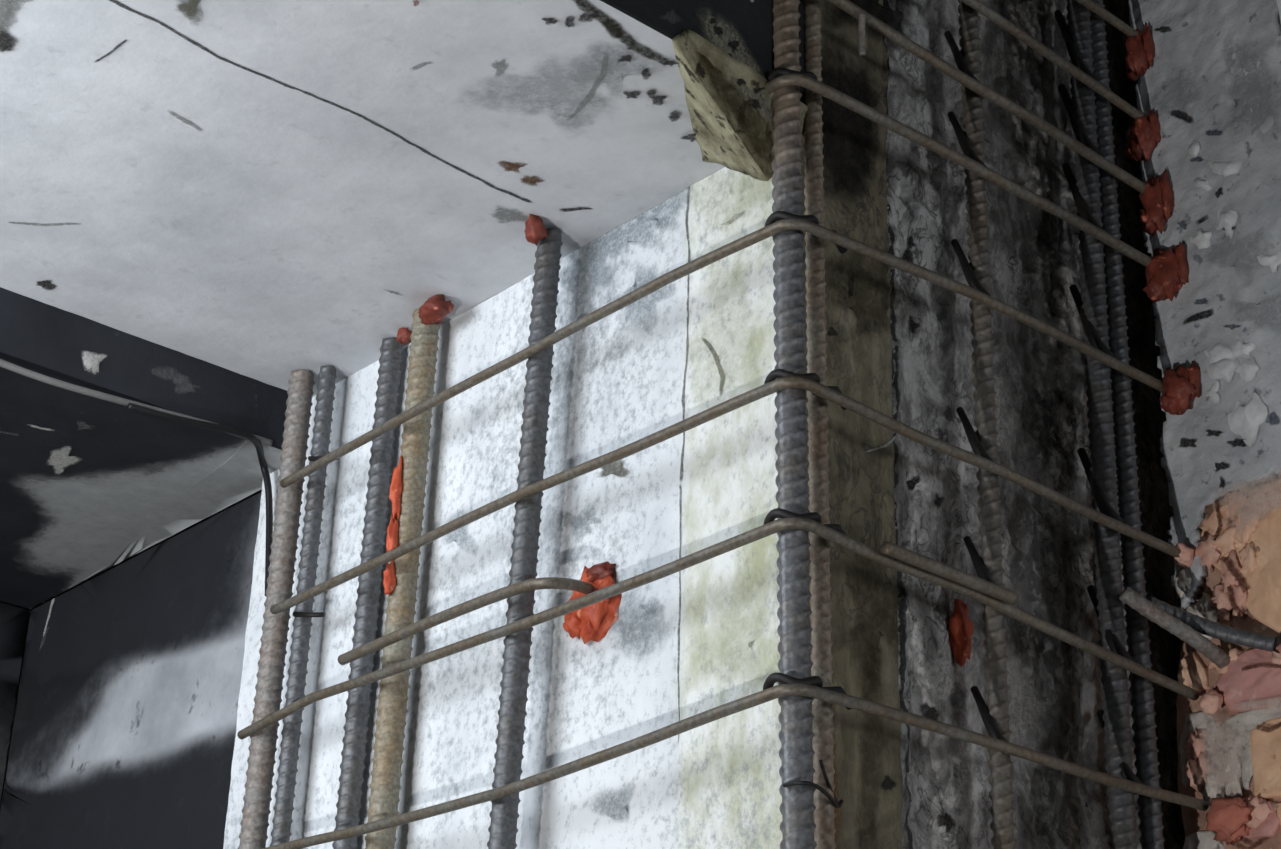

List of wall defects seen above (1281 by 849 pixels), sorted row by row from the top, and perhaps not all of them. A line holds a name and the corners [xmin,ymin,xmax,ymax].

crack [95,0,532,202]
spalling [332,294,454,849]
spalling [487,214,563,849]
spalling [618,55,680,122]
damp [700,54,775,164]
spalling [703,0,838,849]
damp [821,49,878,198]
damp [829,0,905,40]
spalling [958,0,1006,587]
spalling [1066,0,1165,849]
spalling [1179,430,1246,447]
spalling [1172,462,1281,849]